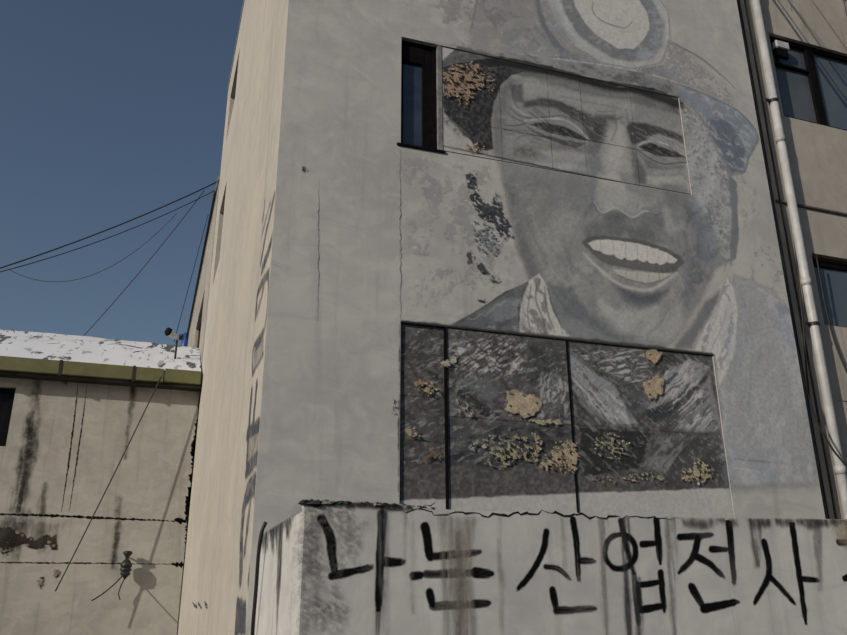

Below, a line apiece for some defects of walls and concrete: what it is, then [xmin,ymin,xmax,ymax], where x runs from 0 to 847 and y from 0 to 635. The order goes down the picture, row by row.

peeling [442,61,496,108]
peeling [466,172,512,283]
peeling [413,379,442,396]
water stain [6,412,37,551]
crack [0,383,201,568]
peeling [469,433,580,477]
peeling [594,433,630,459]
peeling [681,458,714,485]
flaking render [0,526,57,555]